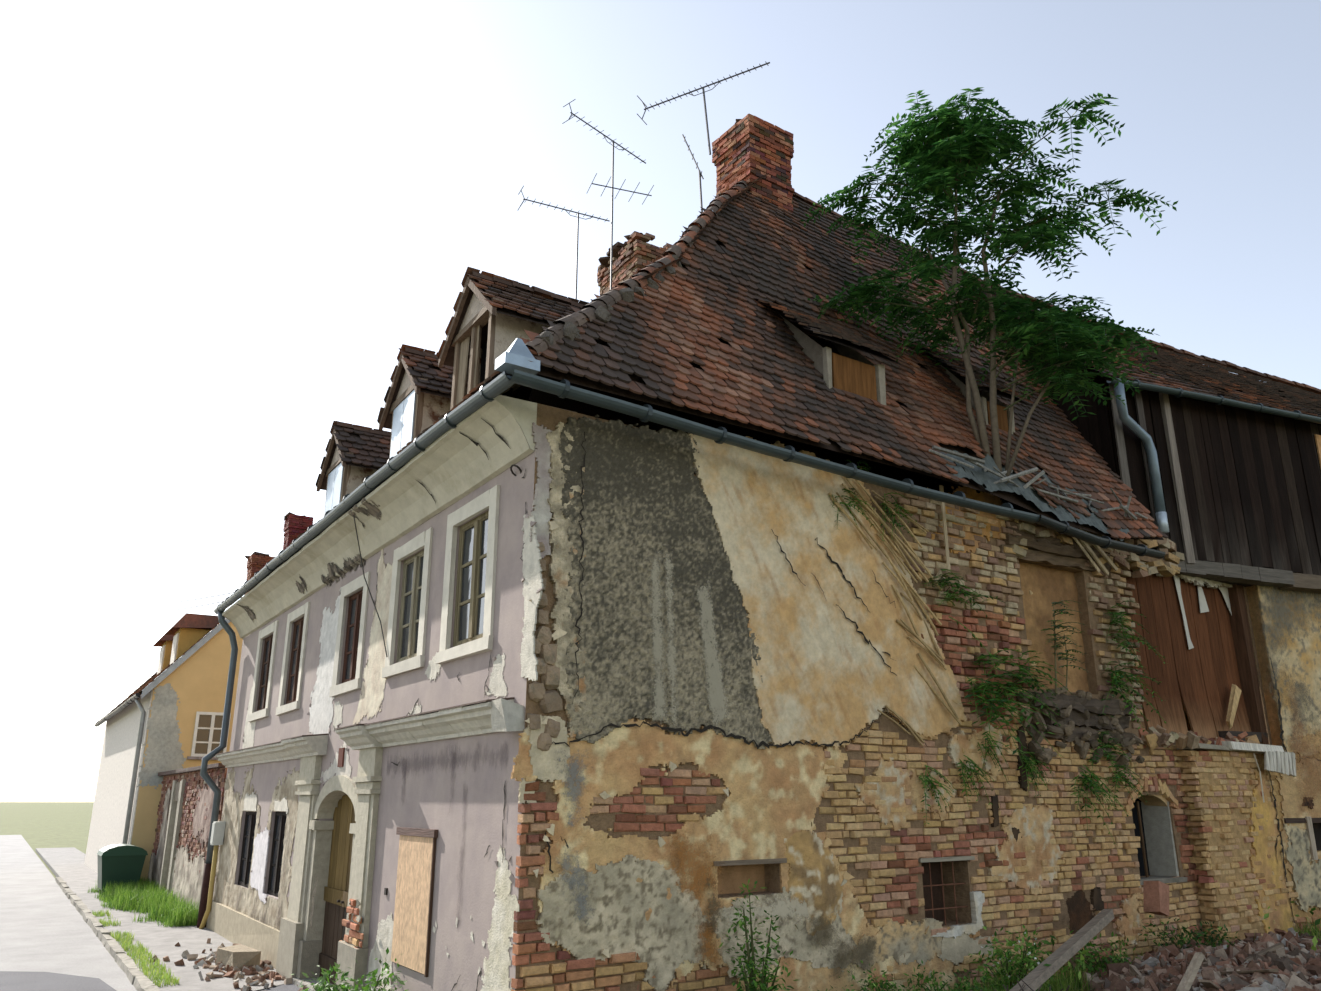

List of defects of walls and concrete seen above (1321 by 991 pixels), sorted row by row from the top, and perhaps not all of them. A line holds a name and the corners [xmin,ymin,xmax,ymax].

peeling [137,683,186,790]
peeling [242,686,256,749]
peeling [212,764,300,930]
peeling [307,549,393,783]
crack [572,432,586,704]
spalling [456,781,741,991]
spalling [590,761,729,847]
crack [552,707,928,749]
crack [771,529,896,675]
spalling [812,487,1204,990]
crack [1268,657,1321,932]